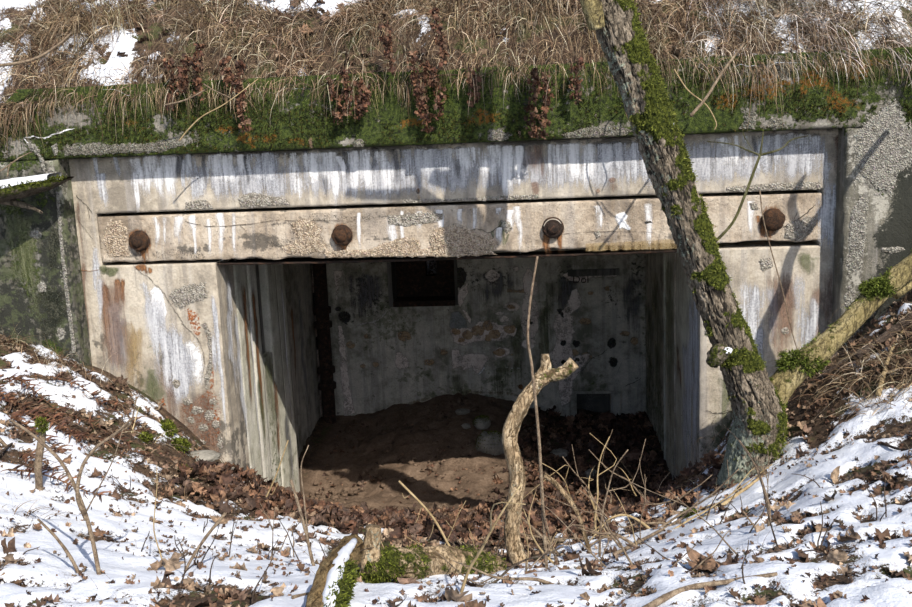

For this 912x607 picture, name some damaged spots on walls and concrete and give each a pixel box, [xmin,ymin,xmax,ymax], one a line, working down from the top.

damp [7,212,66,341]
damp [93,249,103,319]
rust [102,279,127,366]
rust [135,244,152,273]
damp [113,282,293,472]
damp [130,142,650,205]
rust [543,234,562,249]
peeling [549,272,617,405]
peeling [607,331,638,368]
damp [686,133,836,245]
rust [756,207,777,238]
spalling [844,98,912,308]